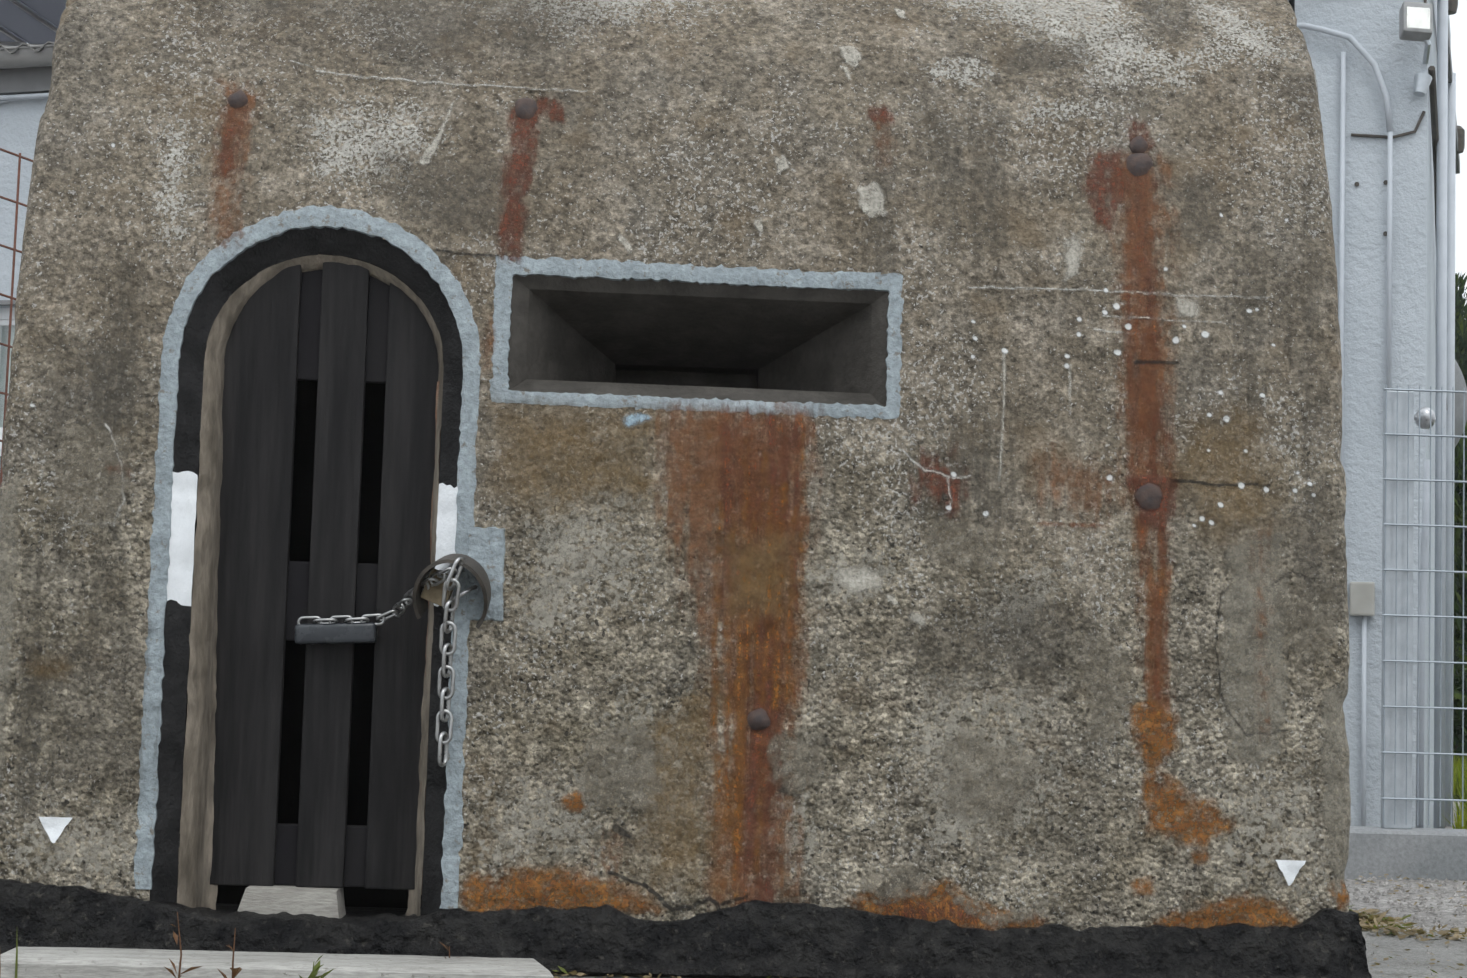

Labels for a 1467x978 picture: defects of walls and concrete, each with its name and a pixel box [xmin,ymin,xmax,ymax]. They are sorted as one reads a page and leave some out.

rust [212,87,255,248]
rust [499,98,564,263]
rust [1085,122,1231,862]
rust [462,867,660,913]
crack [608,871,748,915]
rust [852,880,1043,931]
rust [1154,893,1298,929]